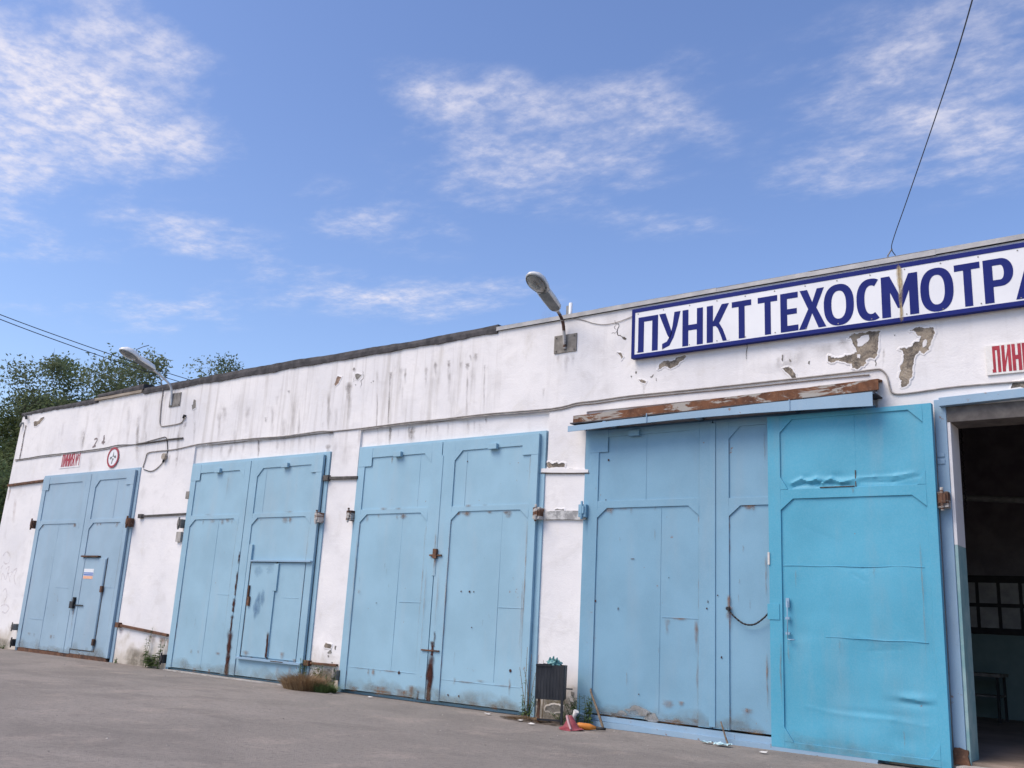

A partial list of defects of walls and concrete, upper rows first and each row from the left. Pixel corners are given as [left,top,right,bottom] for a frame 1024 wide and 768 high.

flaking render [631,353,688,385]
flaking render [826,324,938,390]
rust [224,554,240,675]
rust [401,634,441,701]